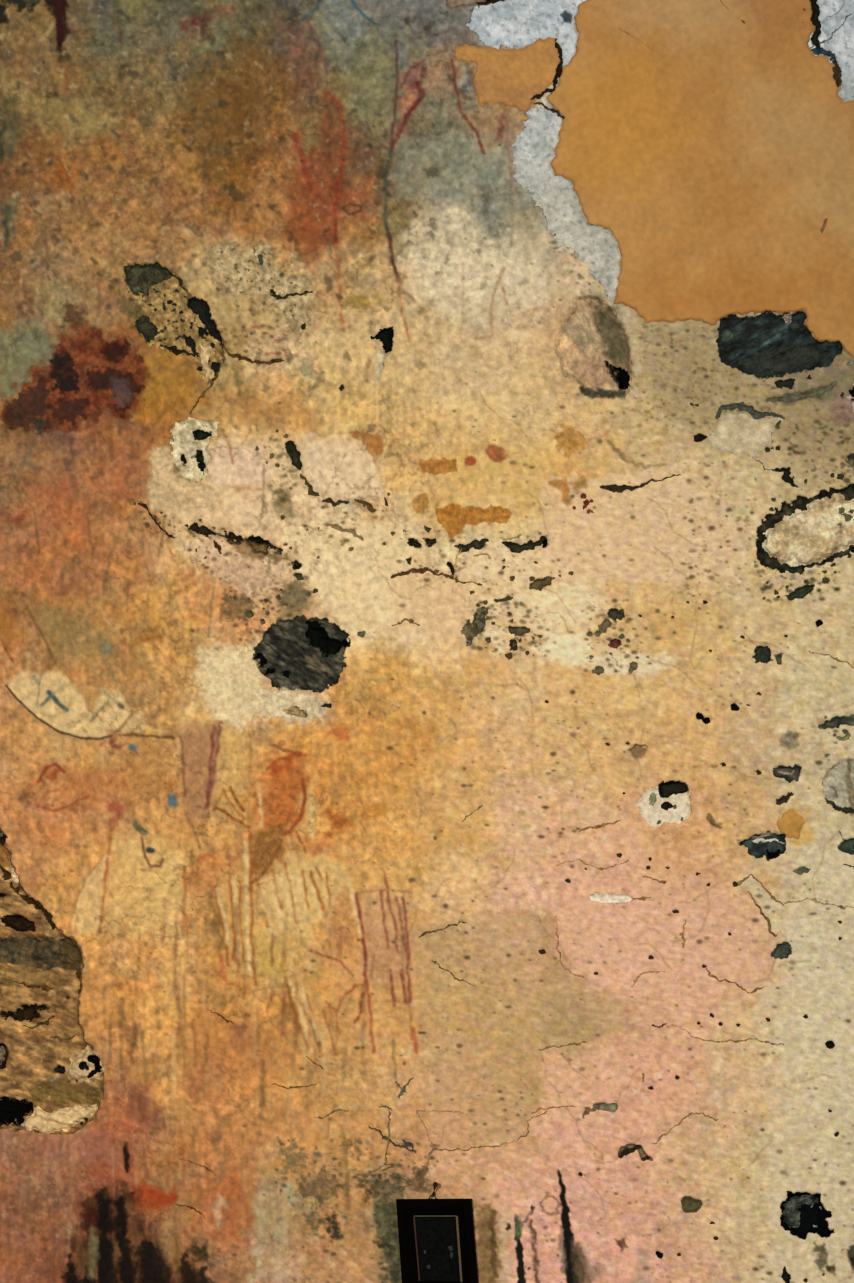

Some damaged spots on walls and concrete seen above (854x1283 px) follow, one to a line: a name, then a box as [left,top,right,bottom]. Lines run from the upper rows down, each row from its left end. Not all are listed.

rust [46,0,70,51]
flaking render [444,0,586,86]
flaking render [810,0,854,102]
flaking render [512,105,632,398]
flaking render [120,241,317,384]
flaking render [693,311,854,458]
flaking render [148,417,222,511]
flaking render [754,484,854,601]
flaking render [198,609,365,732]
flaking render [623,779,691,829]
flaking render [0,829,105,1136]
water stain [62,1188,209,1283]